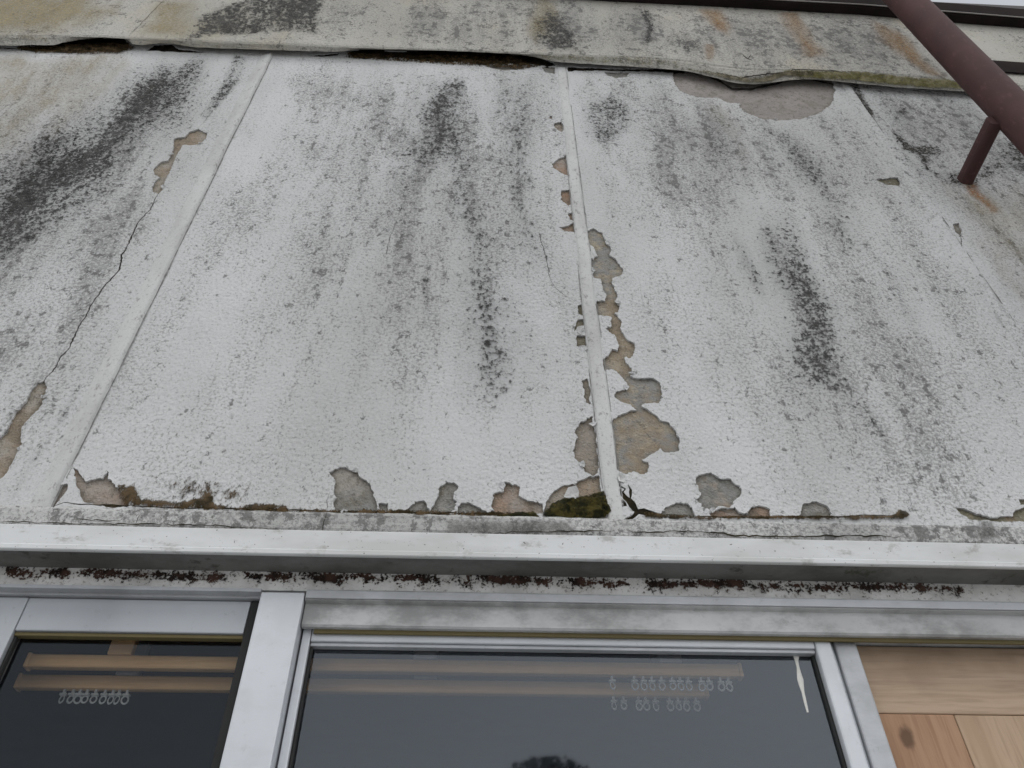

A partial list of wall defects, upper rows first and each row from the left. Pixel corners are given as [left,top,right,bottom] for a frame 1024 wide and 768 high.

peeling [0,383,47,479]
peeling [53,469,129,508]
crack [43,193,159,383]
water stain [0,55,244,263]
peeling [330,468,388,513]
mould [383,78,533,408]
peeling [409,418,601,515]
mould [495,85,547,276]
peeling [588,230,680,483]
peeling [661,474,770,519]
peeling [673,72,835,121]
mould [761,209,859,414]